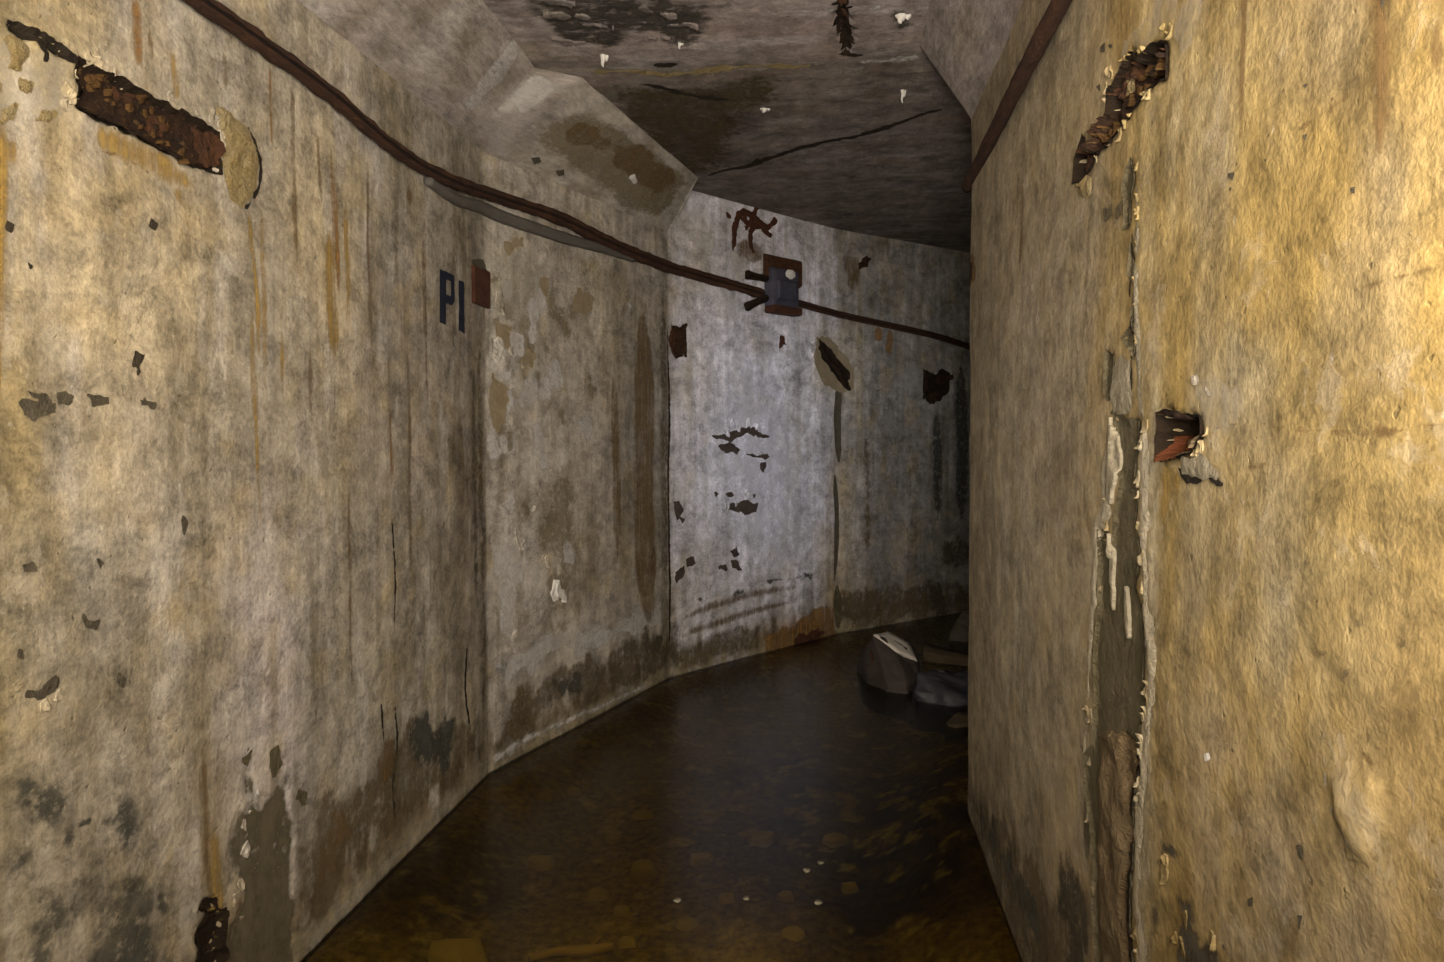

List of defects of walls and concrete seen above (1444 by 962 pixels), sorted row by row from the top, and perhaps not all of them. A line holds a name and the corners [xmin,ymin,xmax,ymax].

spalling [0,34,34,125]
crack [707,109,942,176]
rust [0,136,16,297]
spalling [35,49,263,348]
rust [726,207,778,262]
spalling [808,336,854,393]
spalling [923,368,954,405]
peeling [712,418,770,473]
peeling [1071,22,1225,962]
spalling [12,675,62,712]